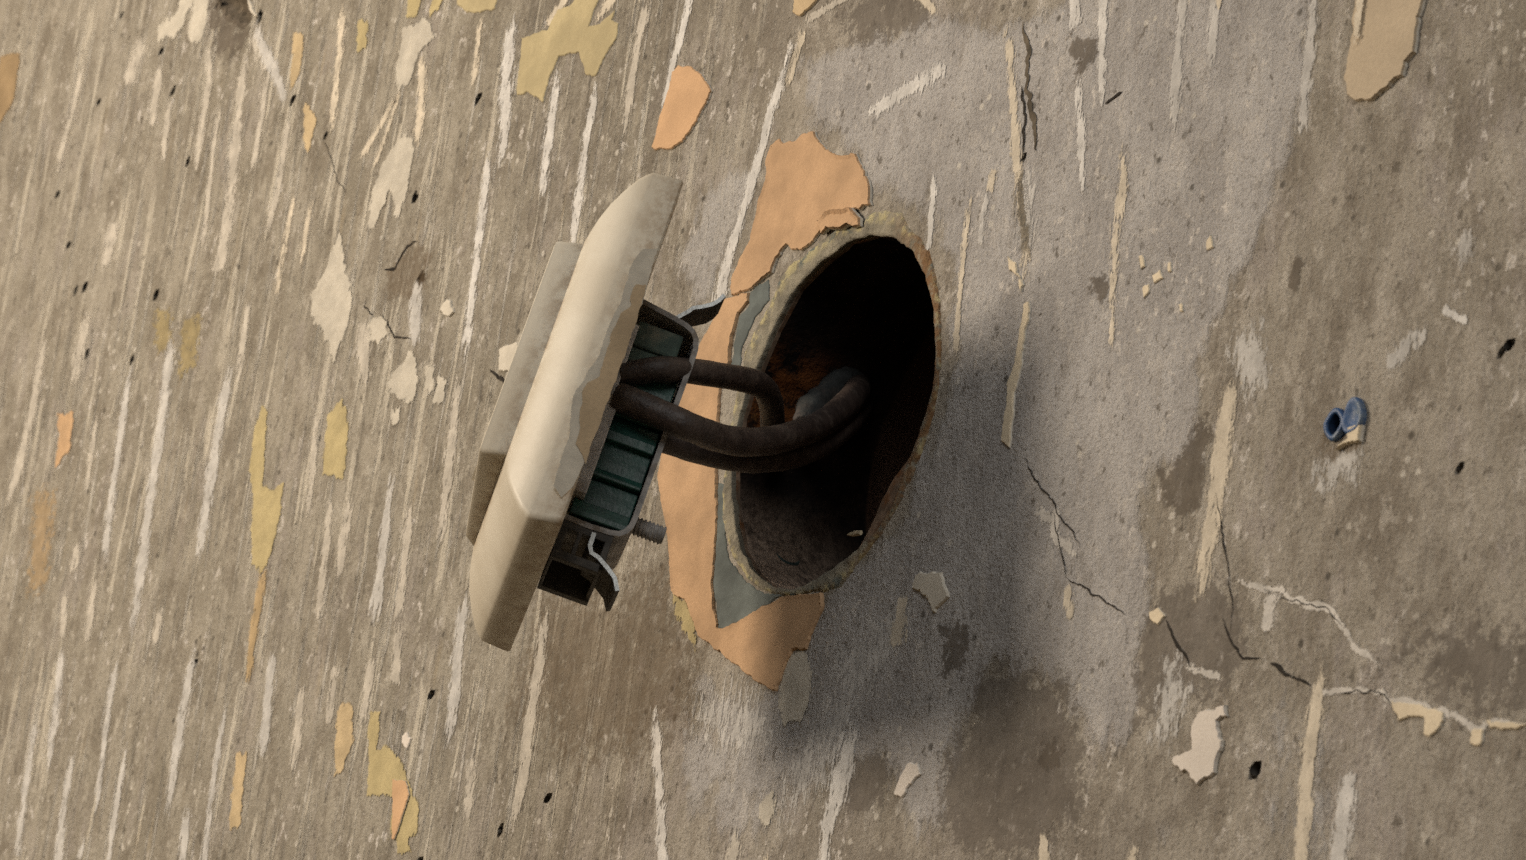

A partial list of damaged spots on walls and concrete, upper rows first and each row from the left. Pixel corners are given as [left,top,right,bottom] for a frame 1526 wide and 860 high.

peeling [516,0,620,102]
peeling [792,0,819,17]
peeling [1344,0,1426,102]
peeling [652,65,713,151]
peeling [657,131,942,692]
crack [1024,457,1526,747]